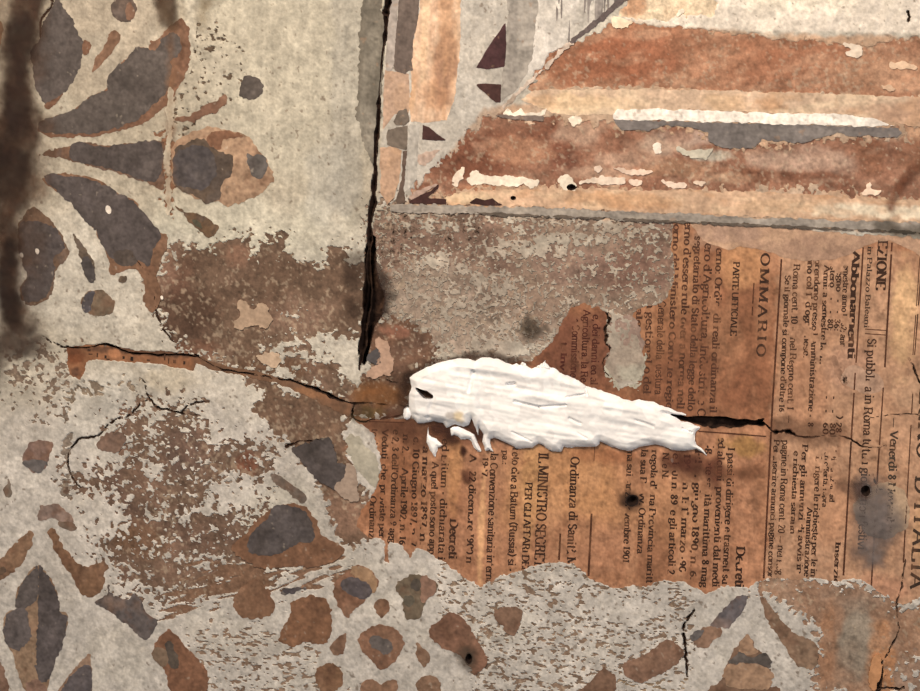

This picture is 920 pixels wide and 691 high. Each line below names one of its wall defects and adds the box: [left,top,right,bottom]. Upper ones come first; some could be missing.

peeling [394,109,410,126]
damp [0,0,42,360]
crack [46,0,409,423]
peeling [4,336,111,425]
crack [67,379,210,488]
peeling [51,113,920,691]
crack [671,414,887,448]
crack [682,609,695,677]
crack [876,559,906,691]